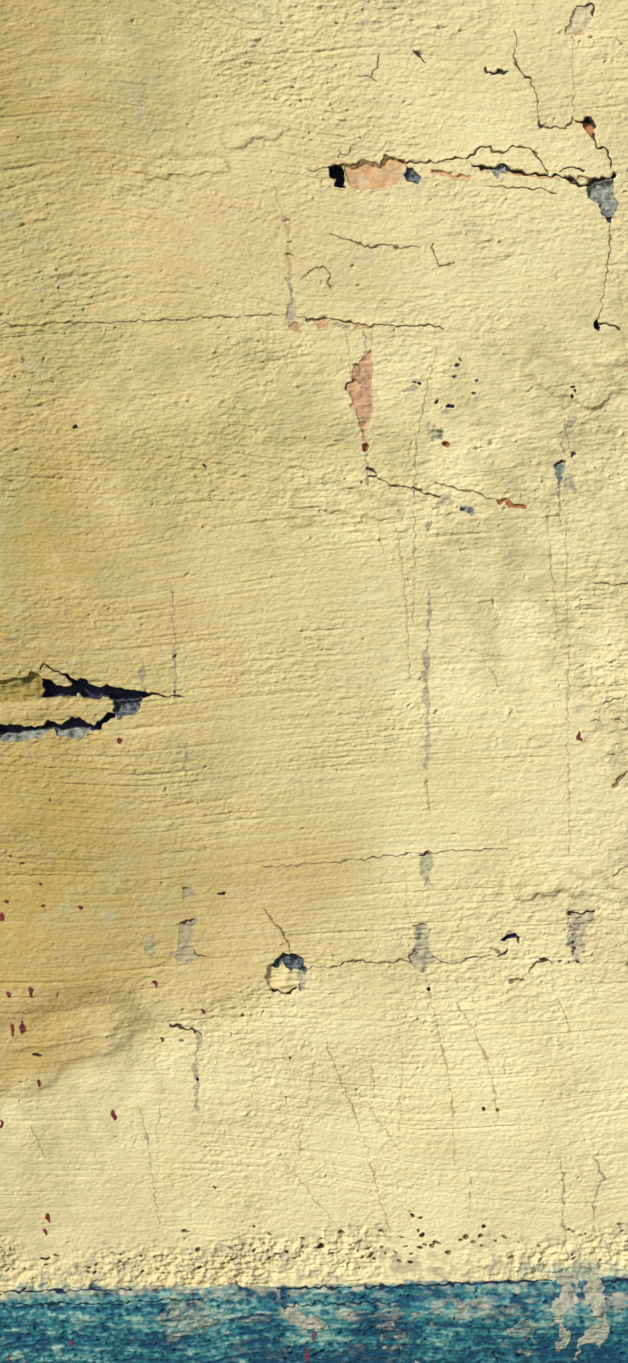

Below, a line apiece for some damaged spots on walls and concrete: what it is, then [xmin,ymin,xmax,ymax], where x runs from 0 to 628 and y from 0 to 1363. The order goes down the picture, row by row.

crack [359,53,380,82]
crack [485,30,573,129]
spalling [308,116,619,223]
crack [594,226,628,372]
spalling [0,585,185,742]
spalling [252,1225,334,1259]
spalling [339,1213,520,1265]
peeling [281,1308,332,1334]
peeling [432,1253,624,1361]